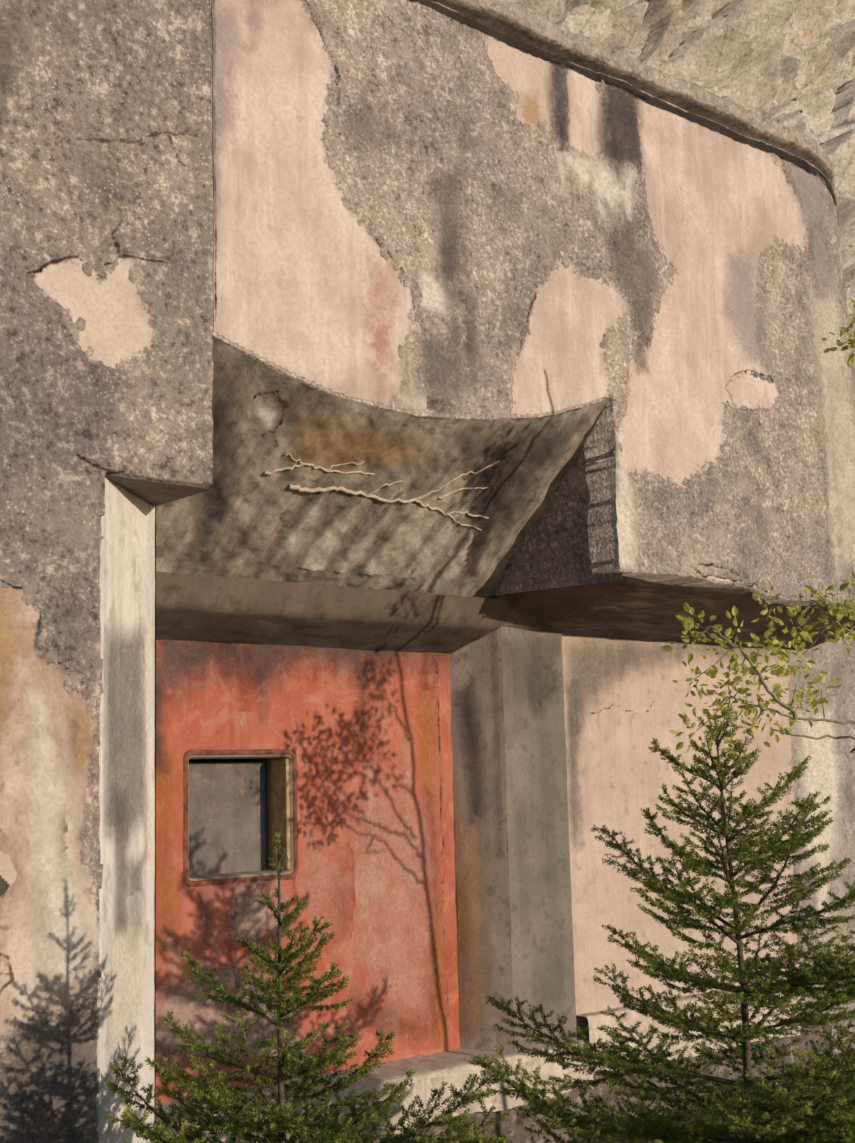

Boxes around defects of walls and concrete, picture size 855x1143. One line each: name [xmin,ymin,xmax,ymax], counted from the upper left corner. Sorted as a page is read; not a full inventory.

spalling [212,0,451,406]
spalling [483,35,612,159]
leakage [552,65,567,136]
leakage [557,85,642,219]
spalling [33,253,154,369]
spalling [509,96,810,491]
spalling [0,576,100,1036]
leakage [108,611,486,1080]
crack [0,953,14,992]